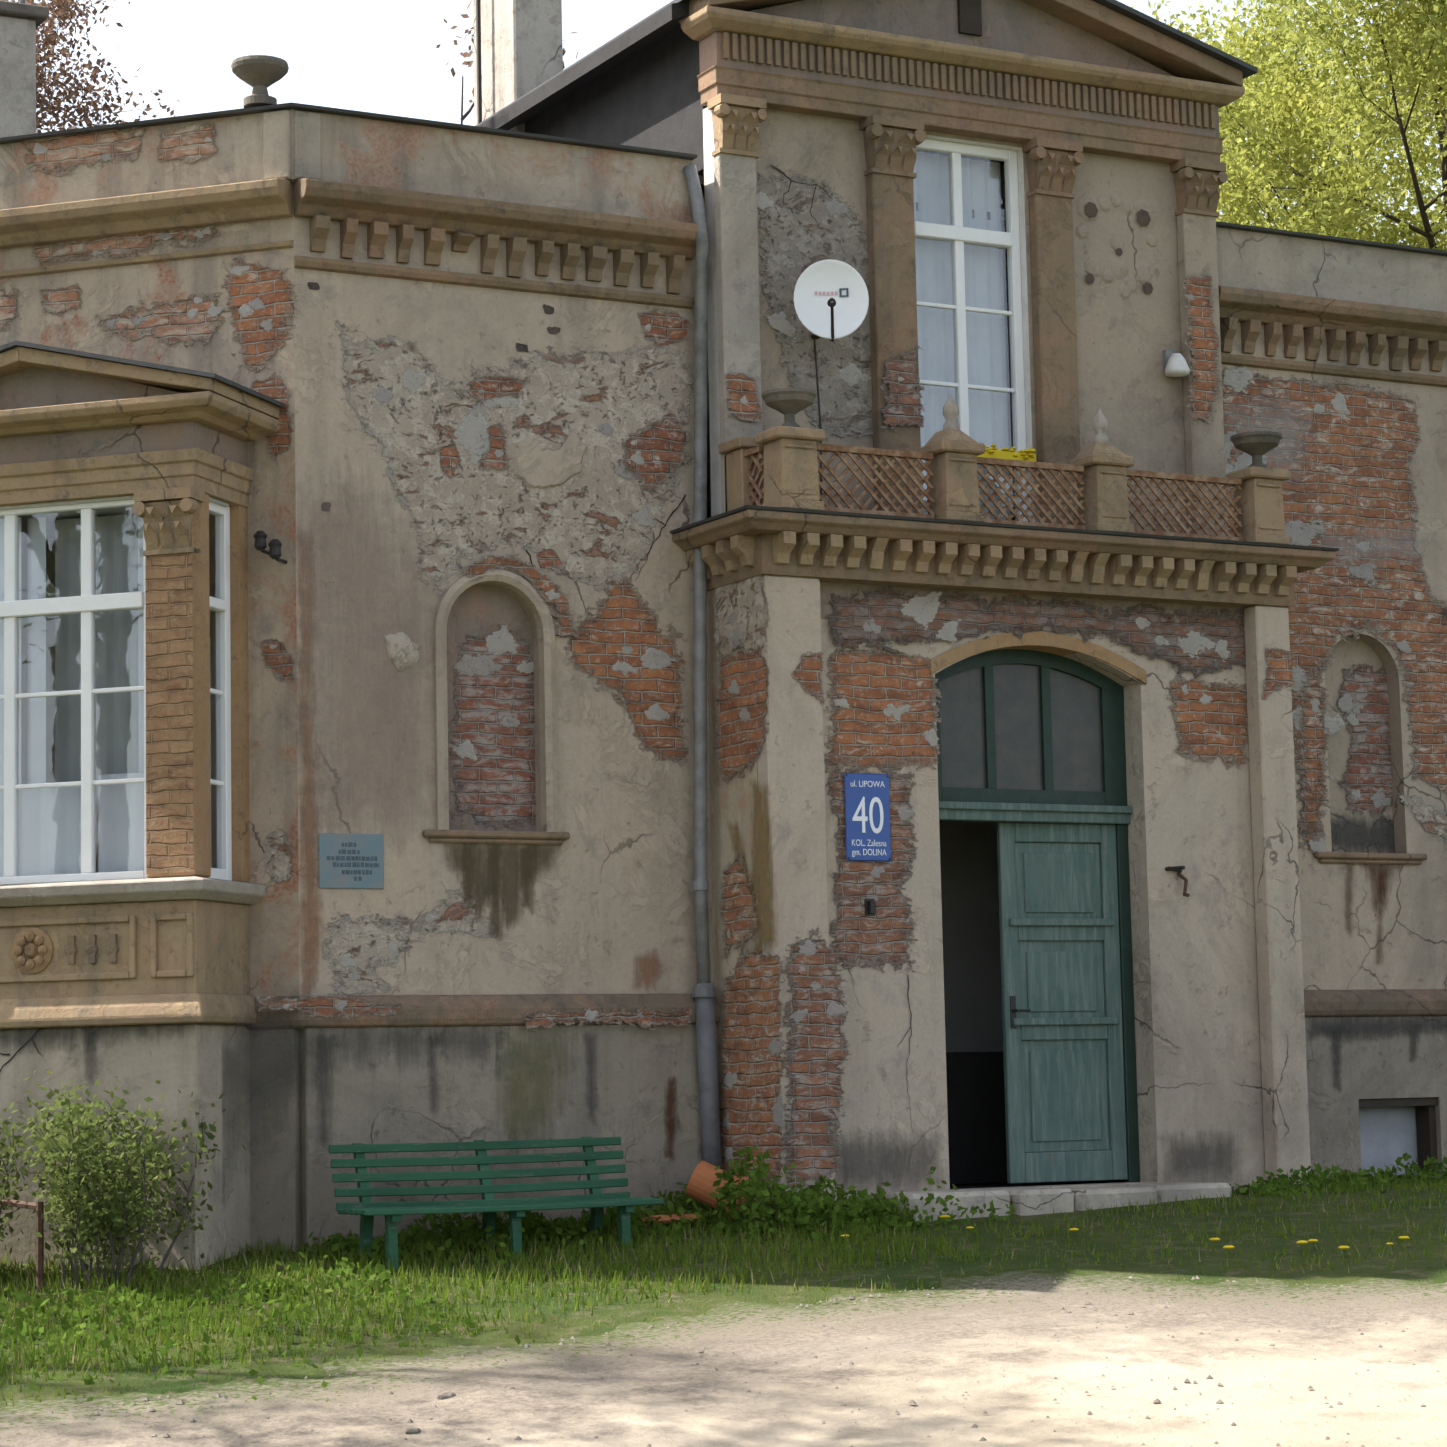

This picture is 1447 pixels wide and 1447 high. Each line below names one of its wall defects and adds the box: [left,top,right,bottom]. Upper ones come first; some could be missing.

flaking render [22,121,218,176]
flaking render [31,225,223,267]
flaking render [40,284,82,318]
flaking render [92,254,320,460]
peeling [328,304,694,766]
flaking render [448,625,536,830]
flaking render [713,273,1447,1188]
leakage [450,844,553,935]
peeling [256,882,500,1020]
crack [0,1028,43,1072]
flaking render [523,1007,692,1031]
leakage [1312,1018,1447,1087]